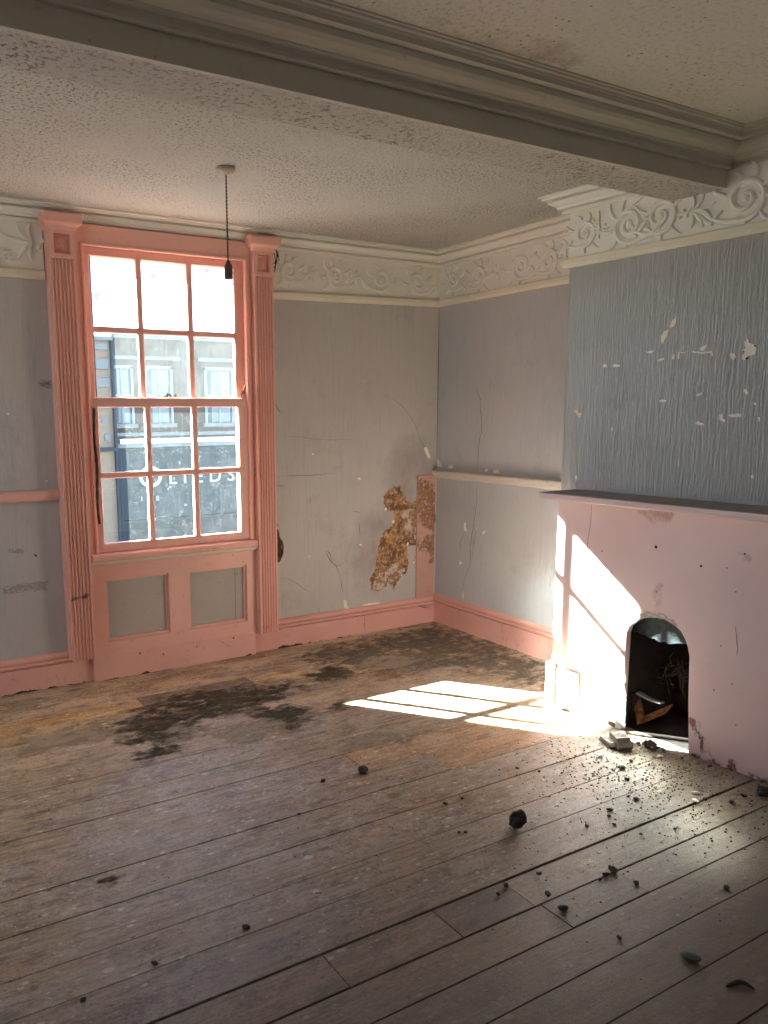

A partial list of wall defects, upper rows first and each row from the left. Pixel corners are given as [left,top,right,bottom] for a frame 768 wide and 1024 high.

crack [383,340,439,443]
peeling [647,317,713,361]
spalling [730,339,757,360]
peeling [363,484,417,606]